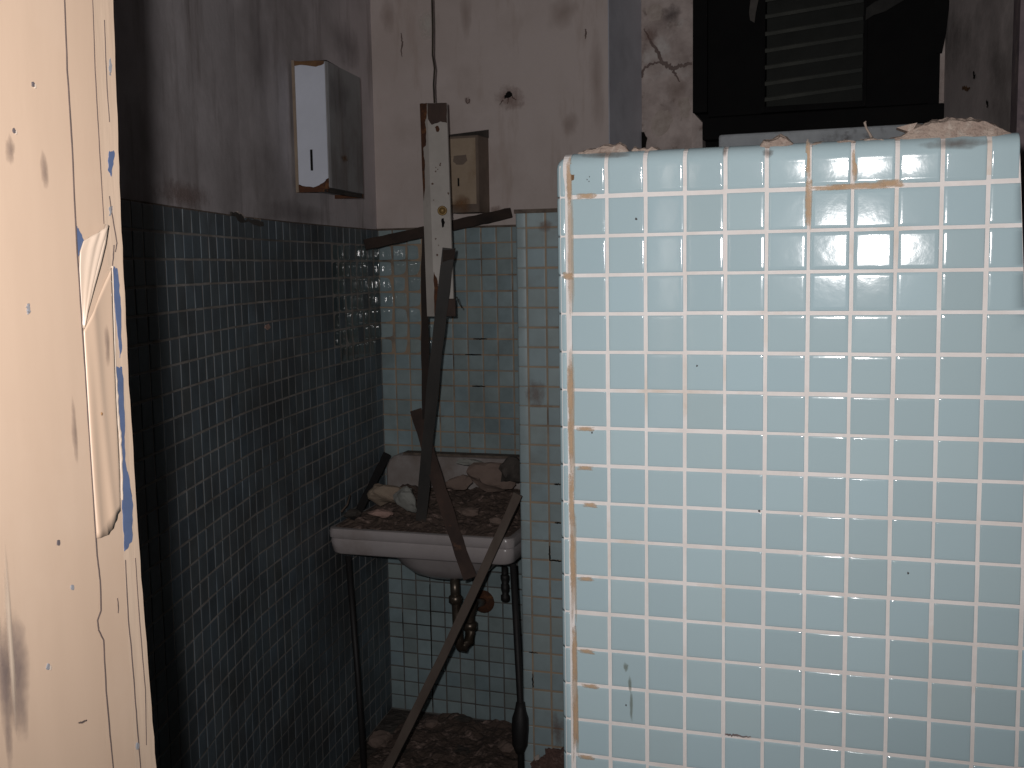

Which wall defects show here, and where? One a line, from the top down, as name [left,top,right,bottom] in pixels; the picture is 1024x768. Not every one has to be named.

crack [641,28,692,82]
peeling [896,123,917,133]
peeling [79,224,123,538]